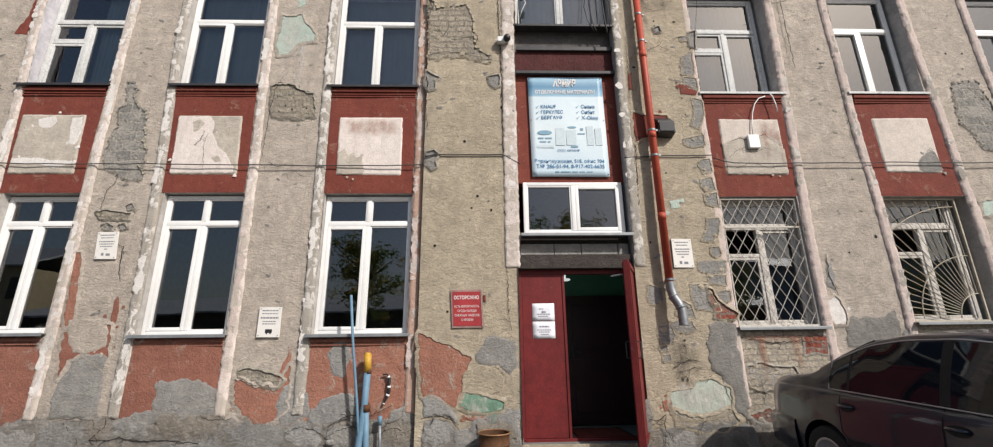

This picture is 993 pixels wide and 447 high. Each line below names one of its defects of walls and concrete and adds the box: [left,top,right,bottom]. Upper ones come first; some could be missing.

spalling [87,59,236,204]
spalling [255,0,338,126]
spalling [413,0,515,193]
spalling [951,68,993,152]
spalling [94,202,138,232]
peeling [410,218,420,280]
spalling [801,258,850,357]
crack [61,418,199,445]
peeling [219,298,306,425]
crack [284,407,460,440]
peeling [406,311,509,422]
peeling [660,375,774,435]